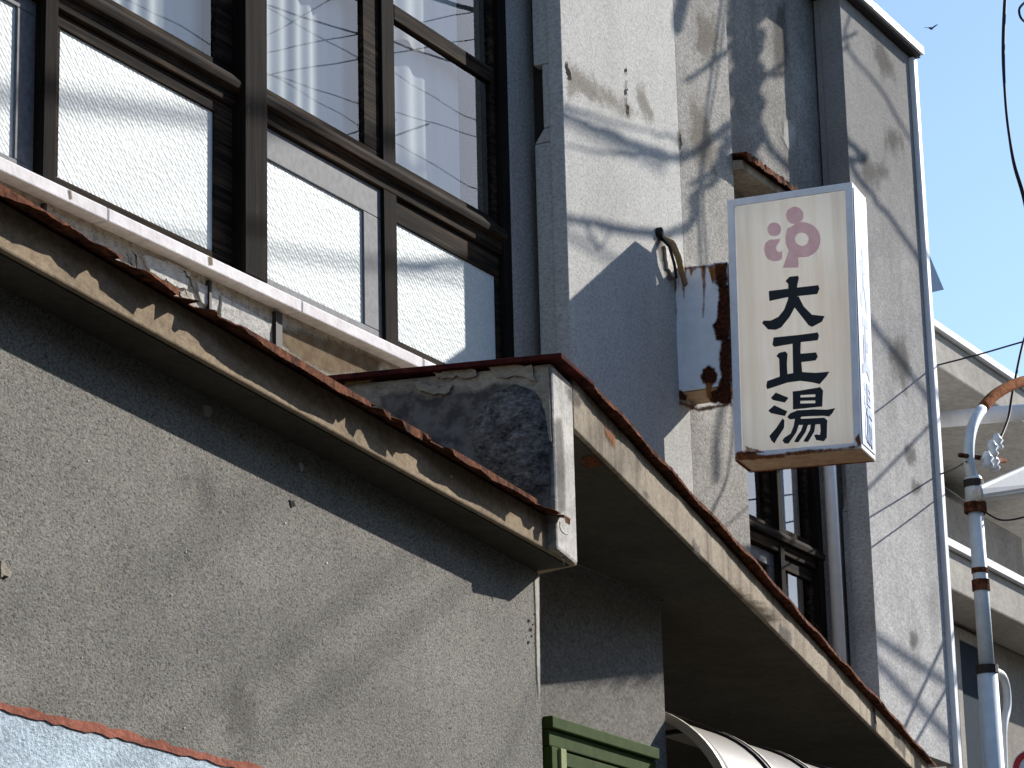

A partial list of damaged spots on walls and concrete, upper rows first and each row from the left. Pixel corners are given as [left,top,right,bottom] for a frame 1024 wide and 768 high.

flaking render [141,255,272,341]